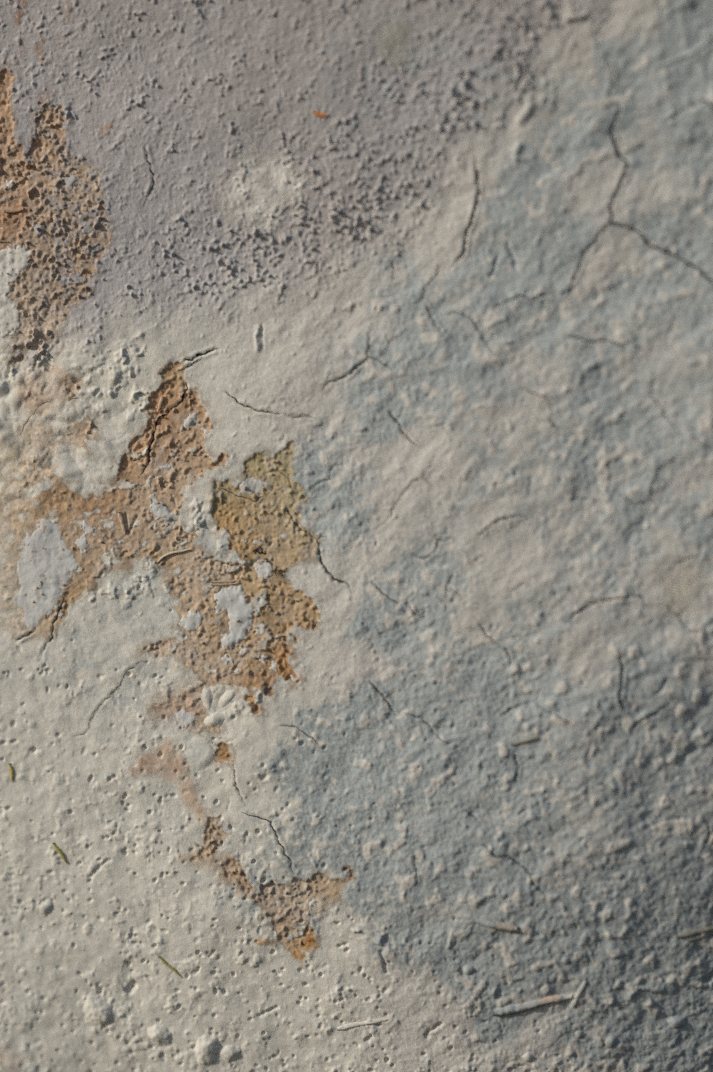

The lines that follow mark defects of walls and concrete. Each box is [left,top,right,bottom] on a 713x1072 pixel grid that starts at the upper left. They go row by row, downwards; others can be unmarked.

peeling [0,65,112,371]
crack [322,6,713,389]
crack [226,392,315,418]
crack [374,411,445,529]
peeling [0,362,322,763]
crack [218,463,424,618]
crack [413,515,537,561]
crack [368,679,463,744]
crack [618,650,681,729]
crack [232,764,292,871]
peeling [199,817,355,959]
crack [464,809,546,906]